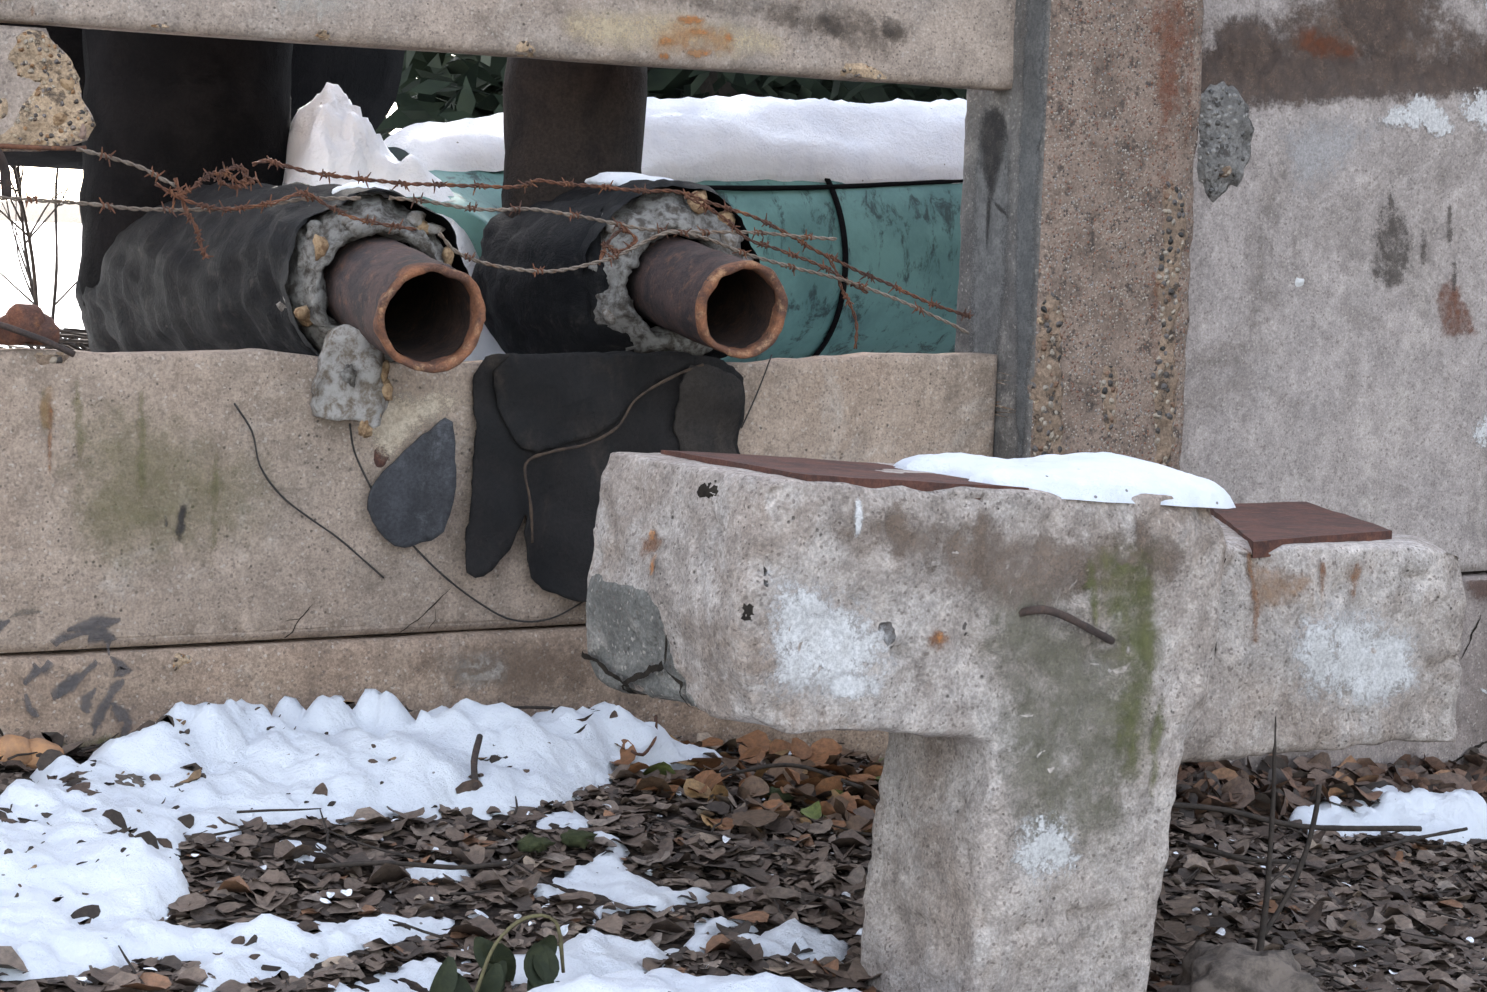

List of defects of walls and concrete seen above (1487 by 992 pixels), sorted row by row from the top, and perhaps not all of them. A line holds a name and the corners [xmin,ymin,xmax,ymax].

spalling [0,29,96,197]
corrosion [678,16,710,58]
leakage [1201,0,1487,109]
leakage [1373,186,1427,287]
corrosion [1437,204,1473,335]
spalling [0,322,76,365]
spalling [586,574,698,708]
leakage [770,582,888,699]
leakage [836,500,1179,672]
leakage [1151,715,1163,785]